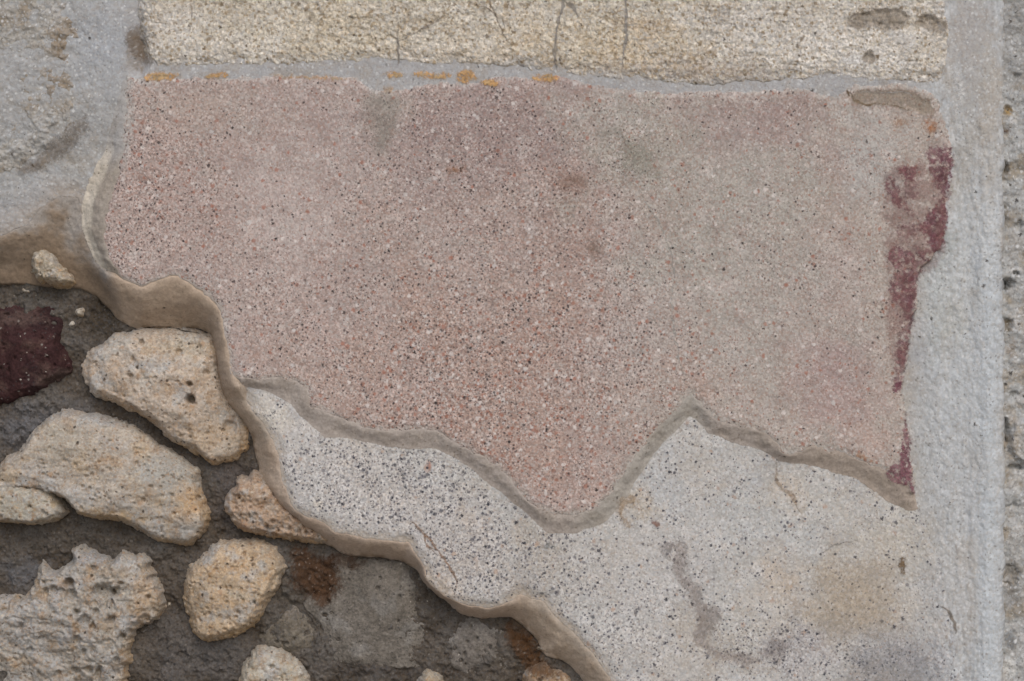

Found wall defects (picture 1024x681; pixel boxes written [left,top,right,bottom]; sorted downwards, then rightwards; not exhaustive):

crack [552,0,578,67]
crack [621,0,629,63]
peeling [885,146,953,311]
spalling [0,80,611,681]
peeling [233,374,962,681]